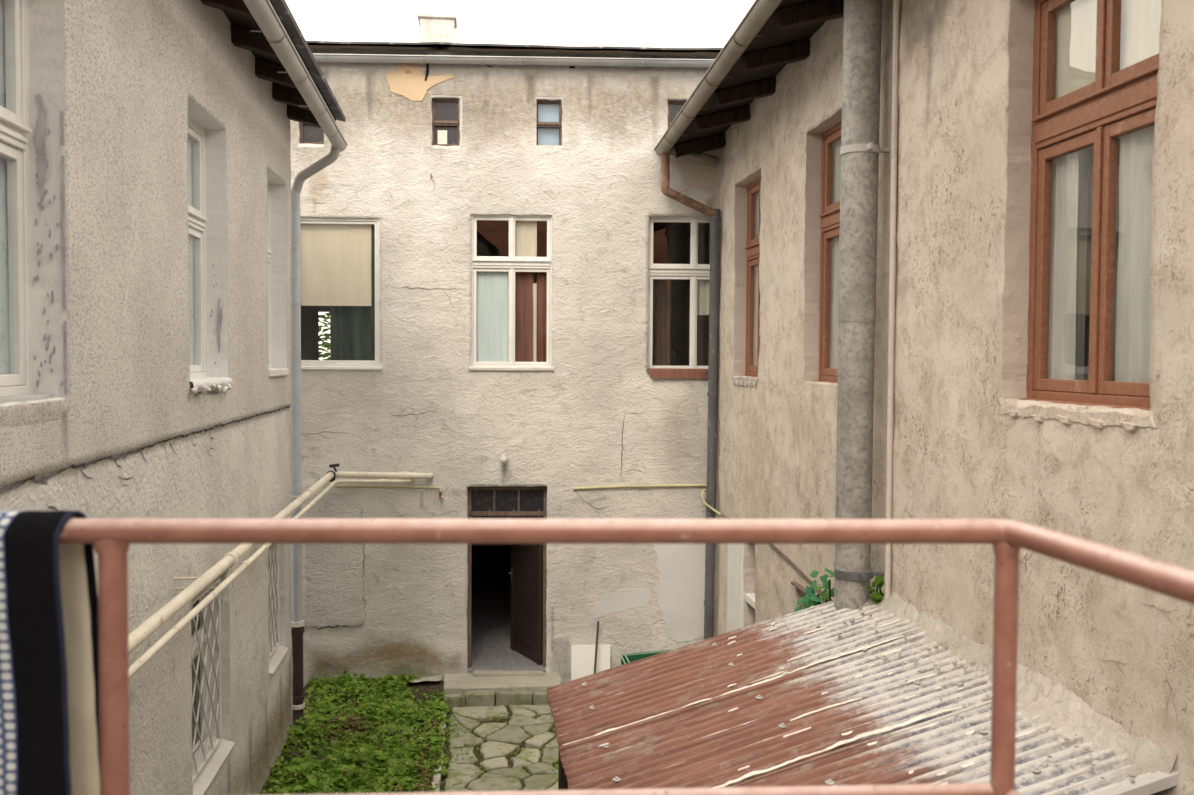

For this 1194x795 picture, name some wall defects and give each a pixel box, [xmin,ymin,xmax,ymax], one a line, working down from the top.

peeling [386,63,454,101]
crack [0,406,291,511]
crack [620,412,648,473]
water stain [192,623,473,795]